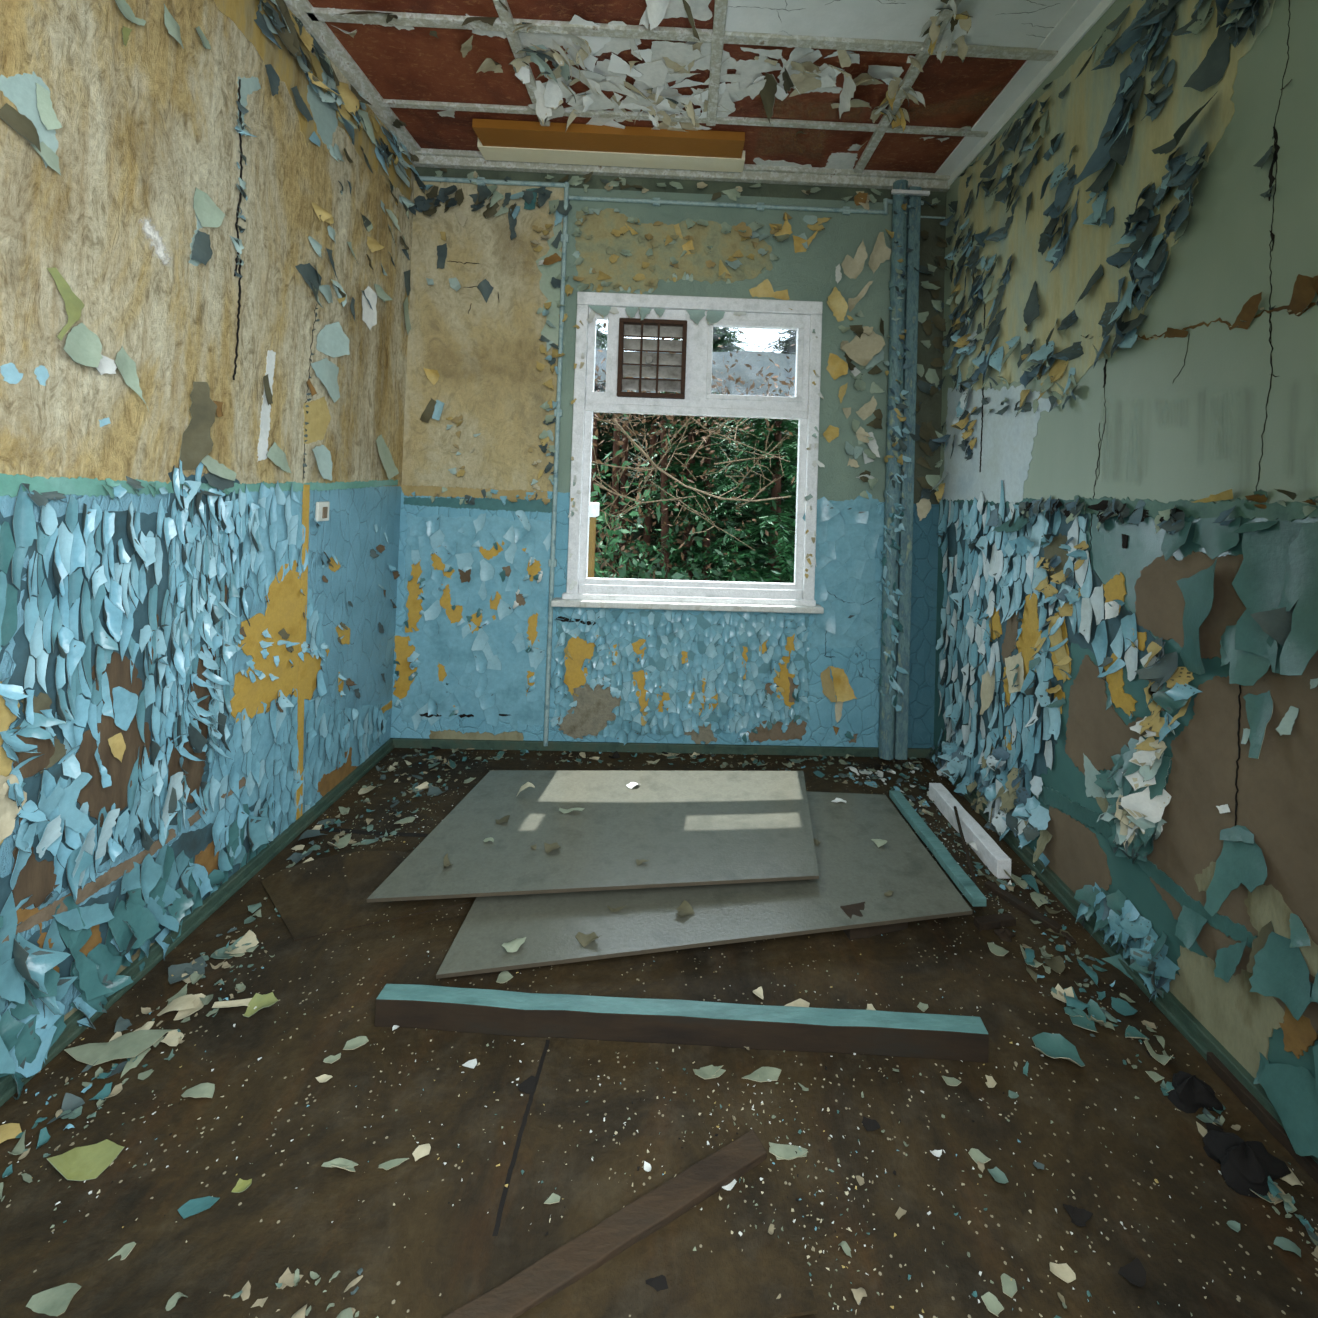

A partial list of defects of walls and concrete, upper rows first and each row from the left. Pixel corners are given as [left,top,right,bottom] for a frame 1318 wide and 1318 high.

peeling [460,0,972,132]
peeling [753,140,868,170]
crack [229,76,261,380]
crack [936,0,1318,817]
peeling [0,1123,22,1143]
peeling [769,1142,807,1160]